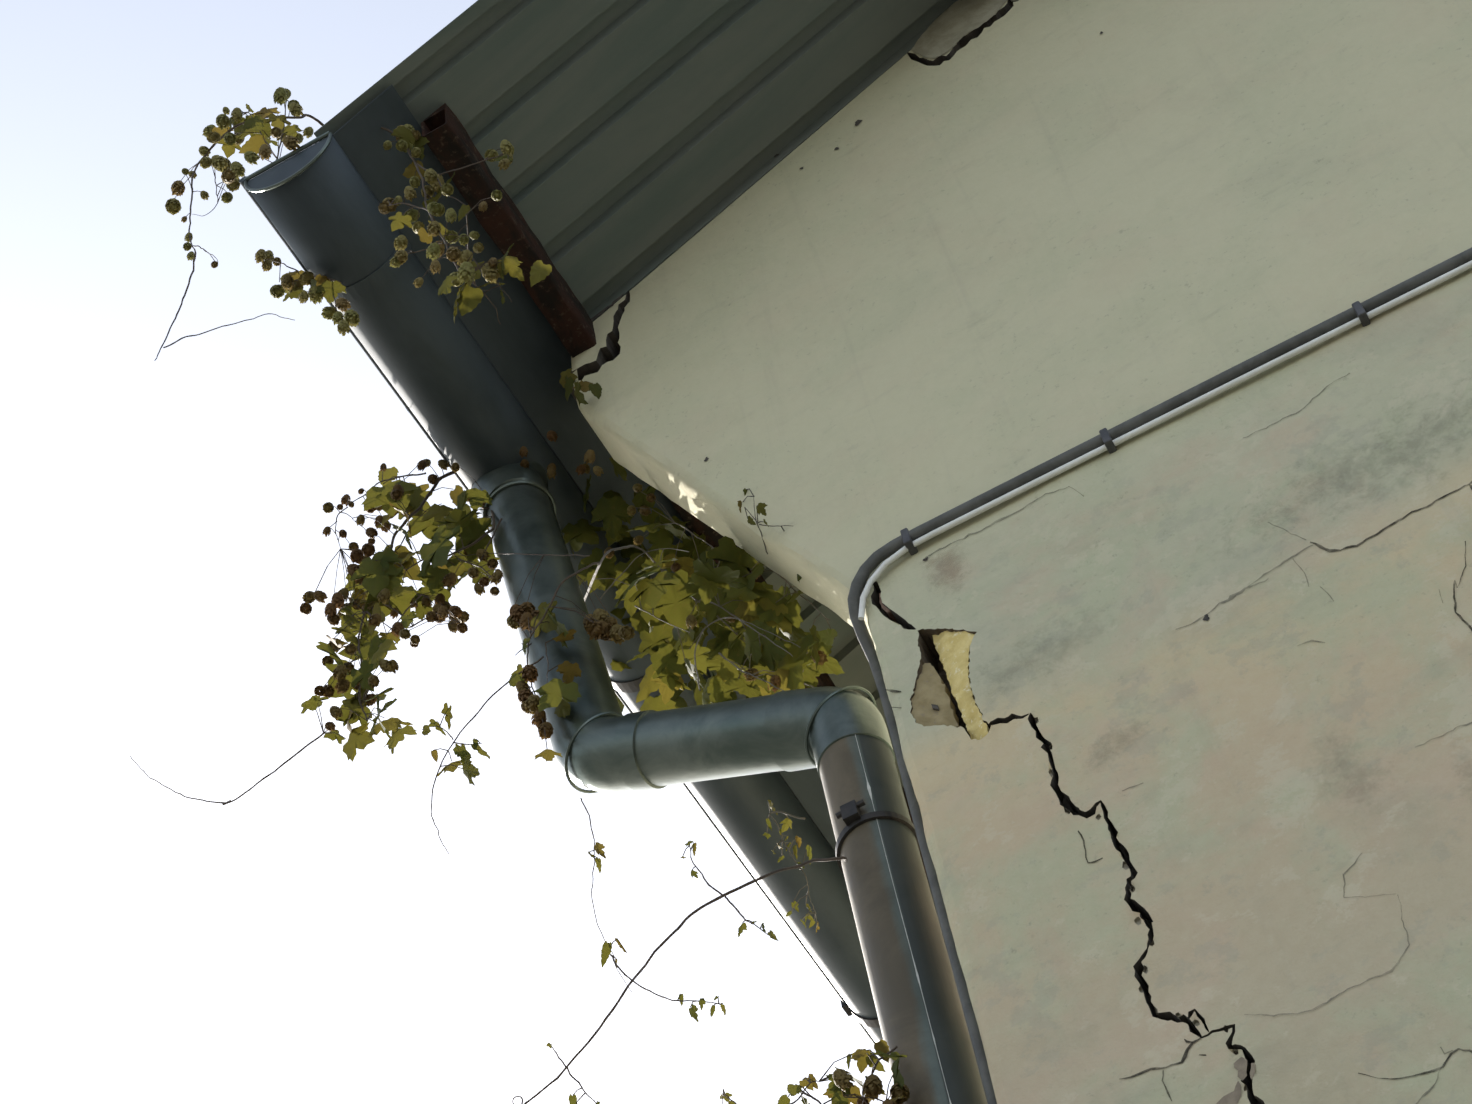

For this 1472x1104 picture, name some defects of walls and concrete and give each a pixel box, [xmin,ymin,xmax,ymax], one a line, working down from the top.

crack [907,0,1016,66]
crack [571,291,630,401]
crack [1310,481,1472,552]
crack [863,581,916,630]
crack [1453,541,1472,631]
spalling [910,628,993,740]
crack [991,713,1265,1104]
crack [1358,1048,1472,1079]